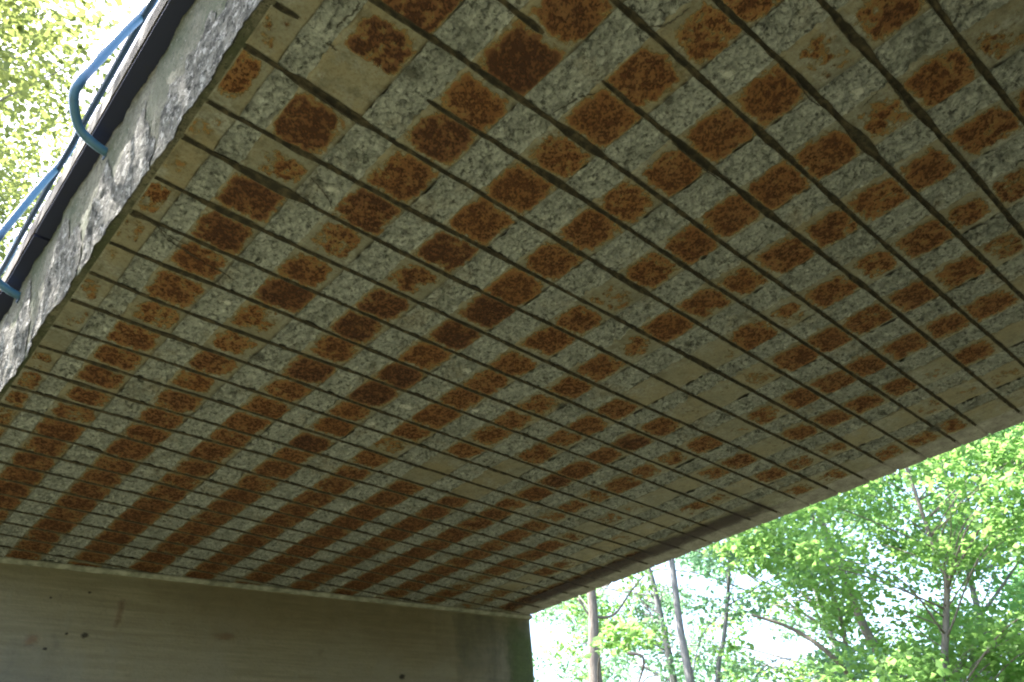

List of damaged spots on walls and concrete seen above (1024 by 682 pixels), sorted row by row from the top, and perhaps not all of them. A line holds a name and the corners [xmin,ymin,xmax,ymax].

rust [0,0,861,585]
rust [447,89,1024,461]